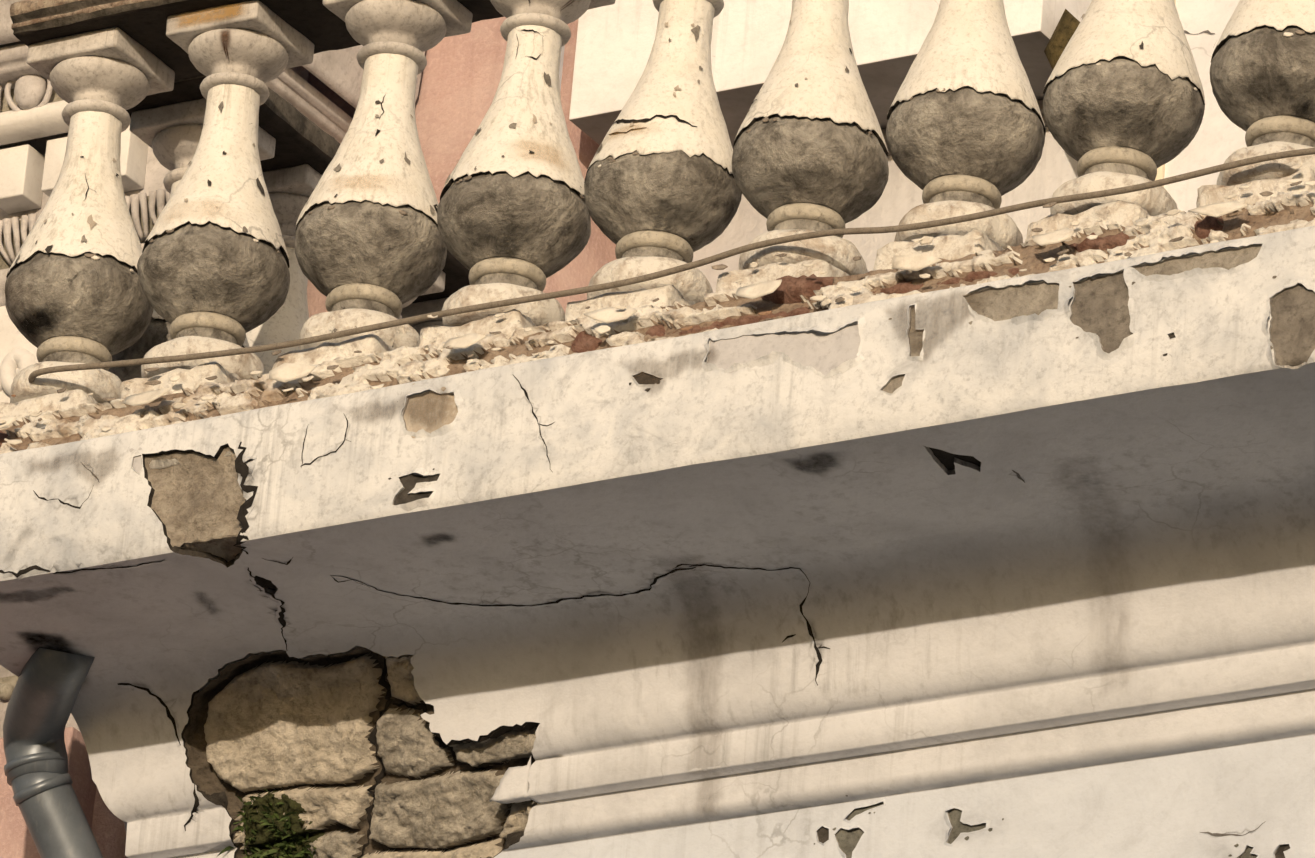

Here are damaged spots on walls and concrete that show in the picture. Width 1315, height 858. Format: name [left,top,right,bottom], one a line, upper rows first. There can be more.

flaking render [5,26,1315,358]
crack [513,375,554,471]
peeling [629,371,664,392]
peeling [645,184,1273,396]
peeling [1261,276,1315,371]
spalling [129,443,246,568]
crack [233,442,292,651]
crack [330,564,830,687]
crack [118,683,181,747]
flaking render [181,647,540,858]
peeling [814,795,886,858]
peeling [943,806,1004,847]